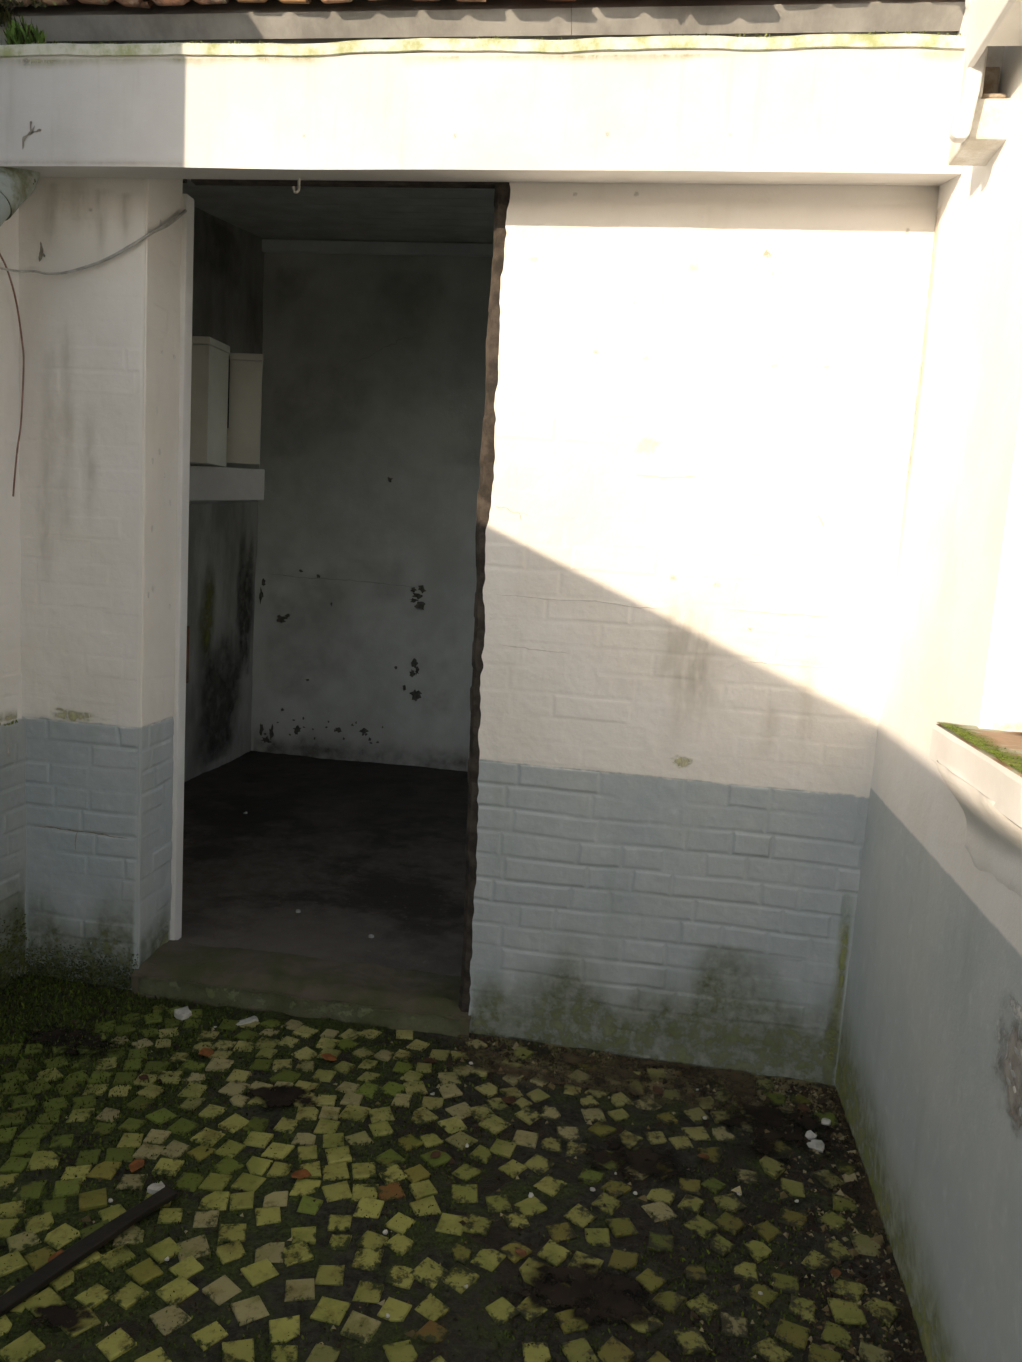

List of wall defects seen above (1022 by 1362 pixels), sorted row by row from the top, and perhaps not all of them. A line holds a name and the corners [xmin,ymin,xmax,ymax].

leakage [201,549,253,760]
spalling [997,1020,1022,1127]